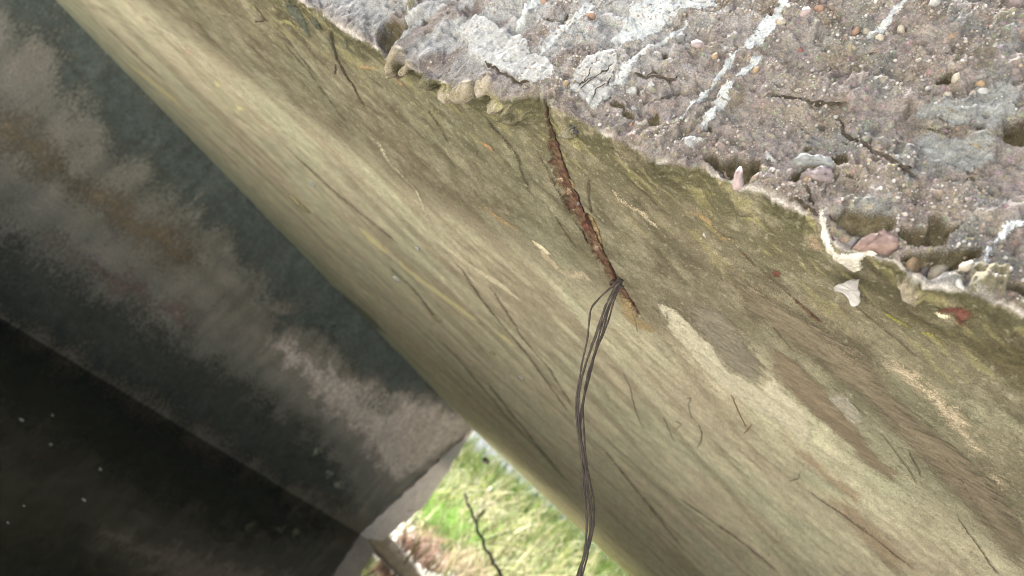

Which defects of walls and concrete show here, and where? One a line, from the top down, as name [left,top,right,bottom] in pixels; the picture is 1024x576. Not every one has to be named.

crack [317,33,381,121]
spalling [376,18,409,60]
peeling [455,14,554,83]
peeling [568,49,655,120]
water stain [141,17,479,322]
spalling [682,125,778,191]
spalling [789,147,853,184]
peeling [907,72,1024,181]
peeling [532,240,591,282]
spalling [828,206,983,273]